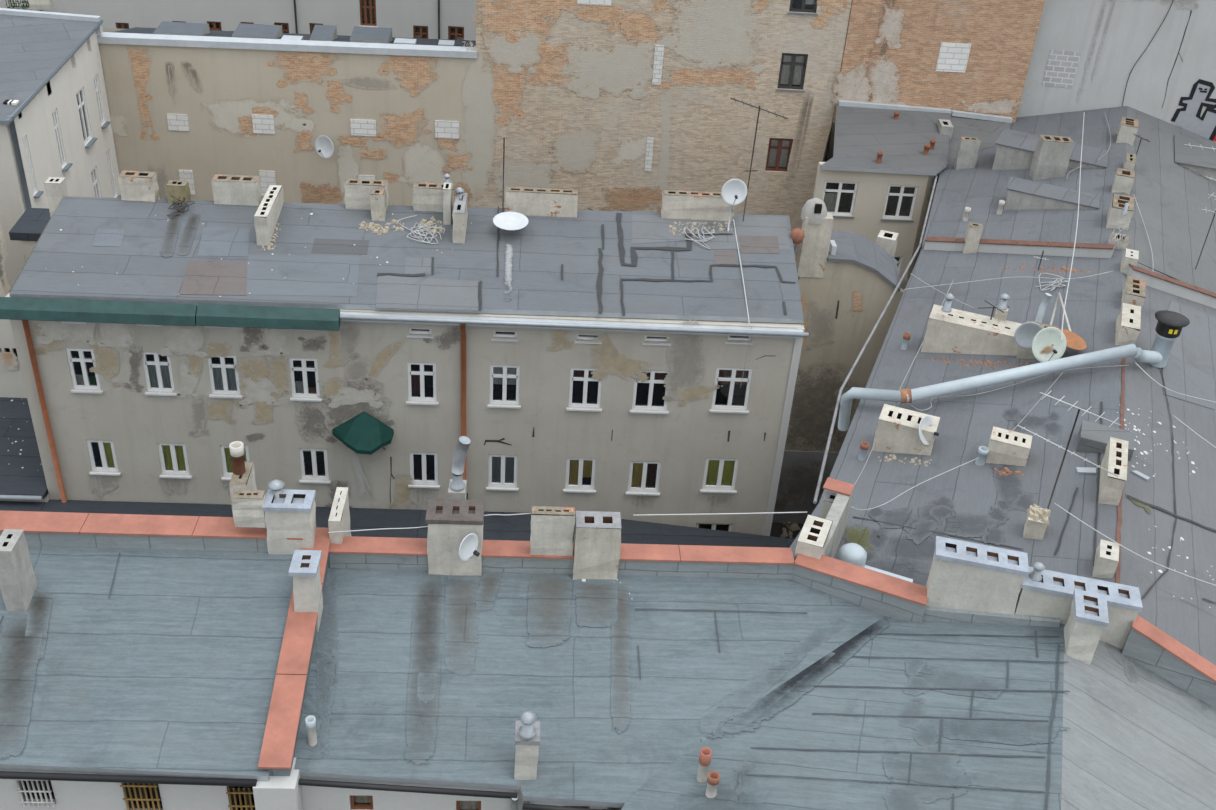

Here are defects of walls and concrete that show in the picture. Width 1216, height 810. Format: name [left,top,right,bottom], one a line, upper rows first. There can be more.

peeling [810,0,848,29]
peeling [127,46,160,141]
leakage [164,61,203,103]
peeling [197,51,353,152]
peeling [471,0,690,126]
peeling [658,62,766,91]
leakage [25,591,52,660]
leakage [417,574,501,703]
leakage [525,575,631,734]